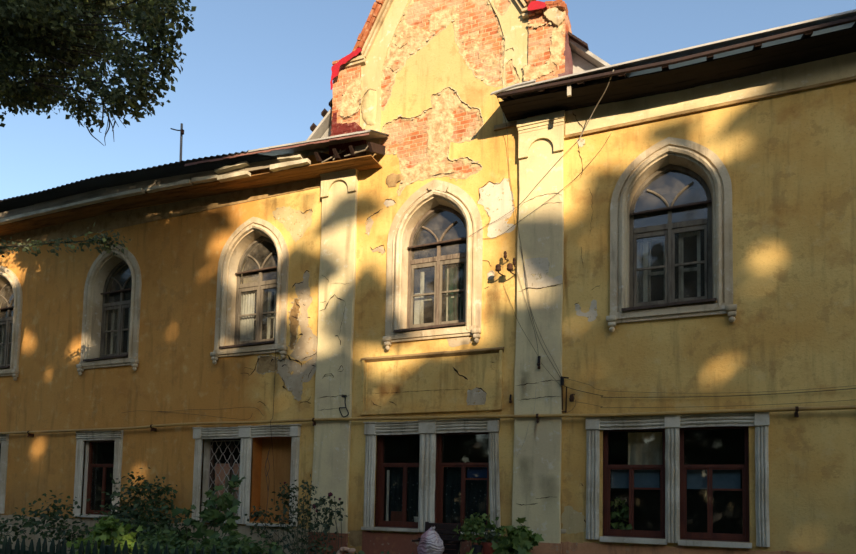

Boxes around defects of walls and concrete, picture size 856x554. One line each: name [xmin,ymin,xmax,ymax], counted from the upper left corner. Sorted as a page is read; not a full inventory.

spalling [338,77,362,118]
spalling [379,87,484,207]
spalling [381,0,564,111]
peeling [273,206,313,242]
peeling [477,178,516,238]
peeling [256,271,318,401]
crack [245,270,349,410]